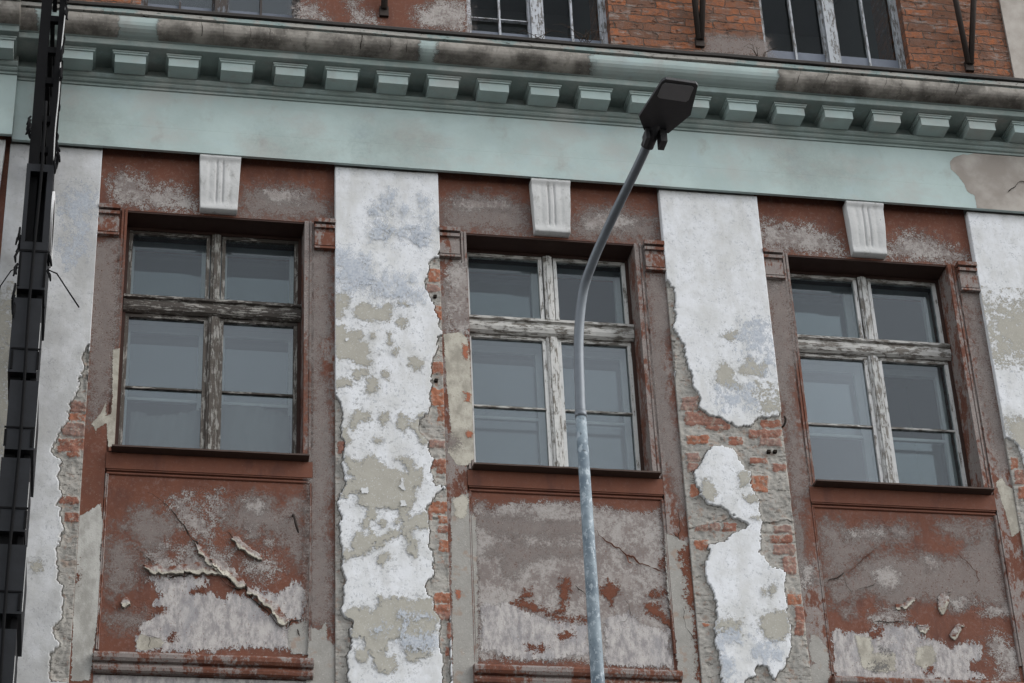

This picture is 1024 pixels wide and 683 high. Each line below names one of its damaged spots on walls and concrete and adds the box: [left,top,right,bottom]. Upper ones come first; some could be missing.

damp [433,41,591,75]
damp [776,69,1024,110]
peeling [950,153,1024,211]
flaking render [27,181,1024,683]
crack [151,493,198,544]
crack [597,531,666,572]
crack [142,552,302,636]